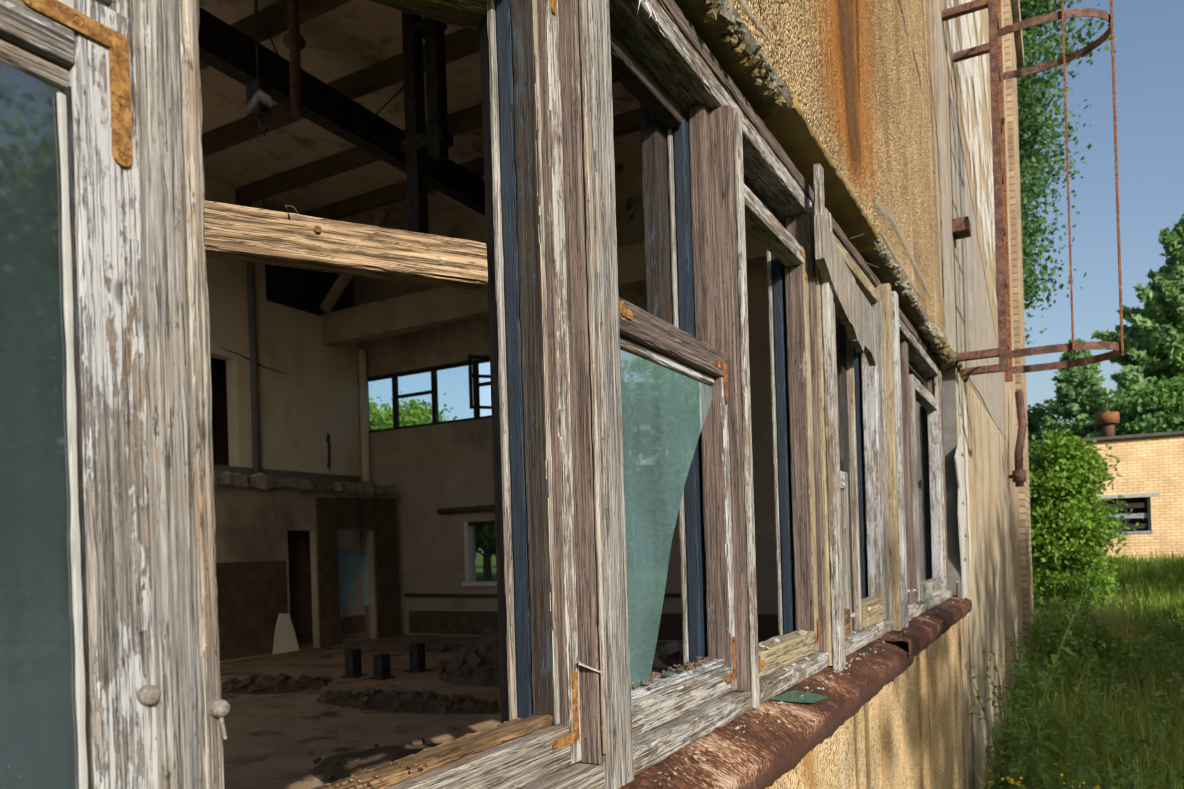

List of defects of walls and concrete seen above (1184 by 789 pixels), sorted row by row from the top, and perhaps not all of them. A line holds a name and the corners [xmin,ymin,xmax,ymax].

corrosion [816,0,874,184]
corrosion [917,647,932,789]